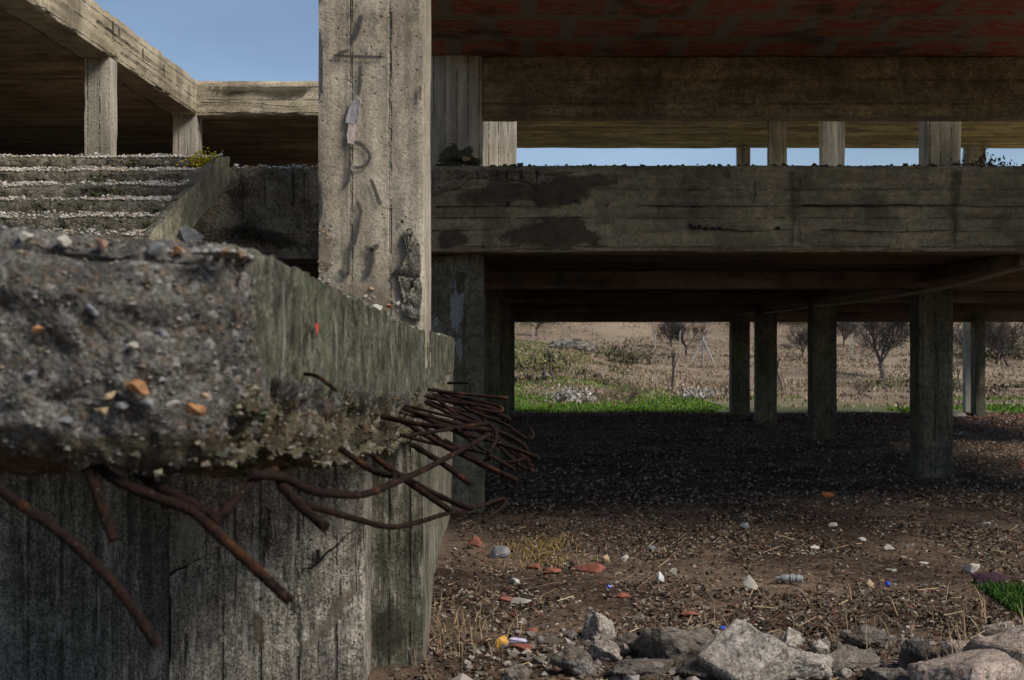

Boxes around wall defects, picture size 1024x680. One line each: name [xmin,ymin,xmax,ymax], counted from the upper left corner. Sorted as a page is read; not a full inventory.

leakage [438,143,482,166]
leakage [457,173,618,248]
spalling [317,224,336,283]
spalling [345,219,440,321]
spalling [246,268,540,532]
crack [301,524,360,570]